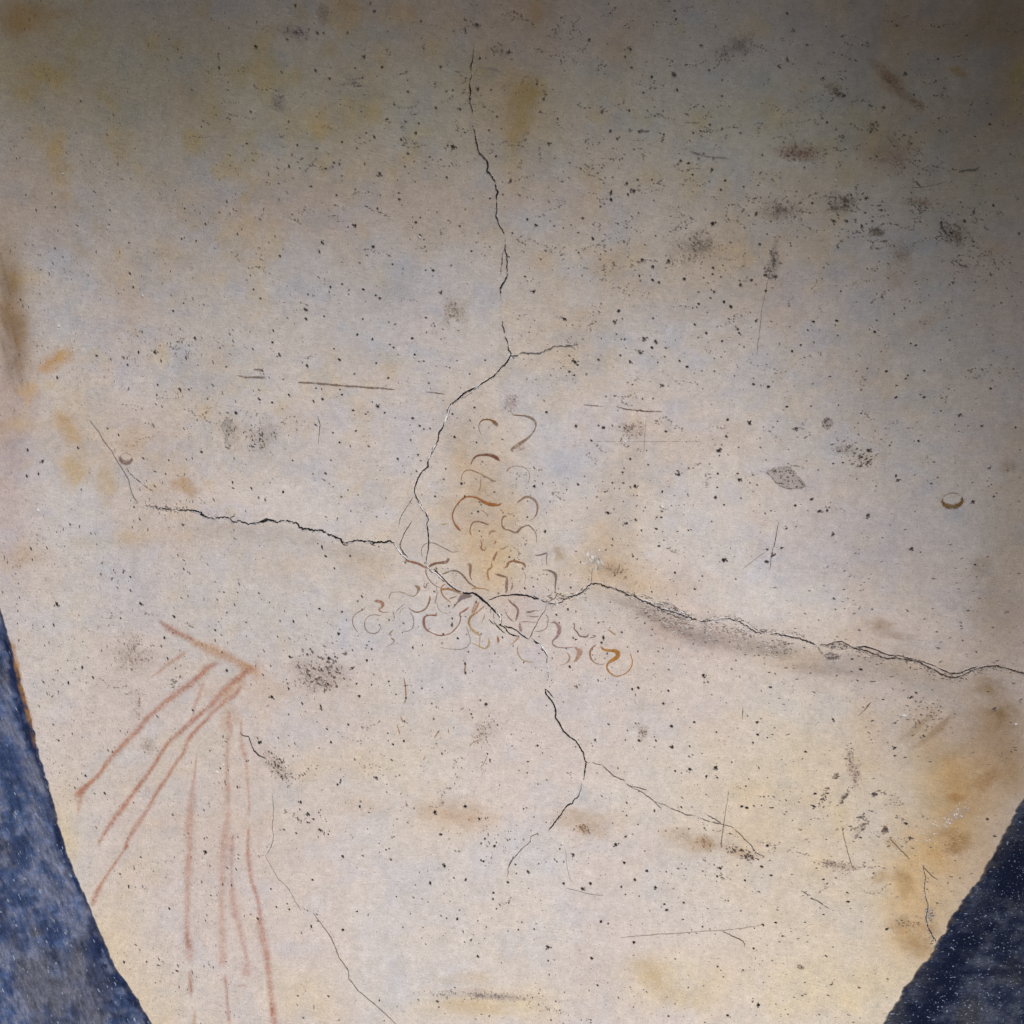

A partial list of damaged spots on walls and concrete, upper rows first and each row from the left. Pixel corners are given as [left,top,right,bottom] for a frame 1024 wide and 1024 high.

crack [465,28,508,293]
crack [89,321,1024,876]